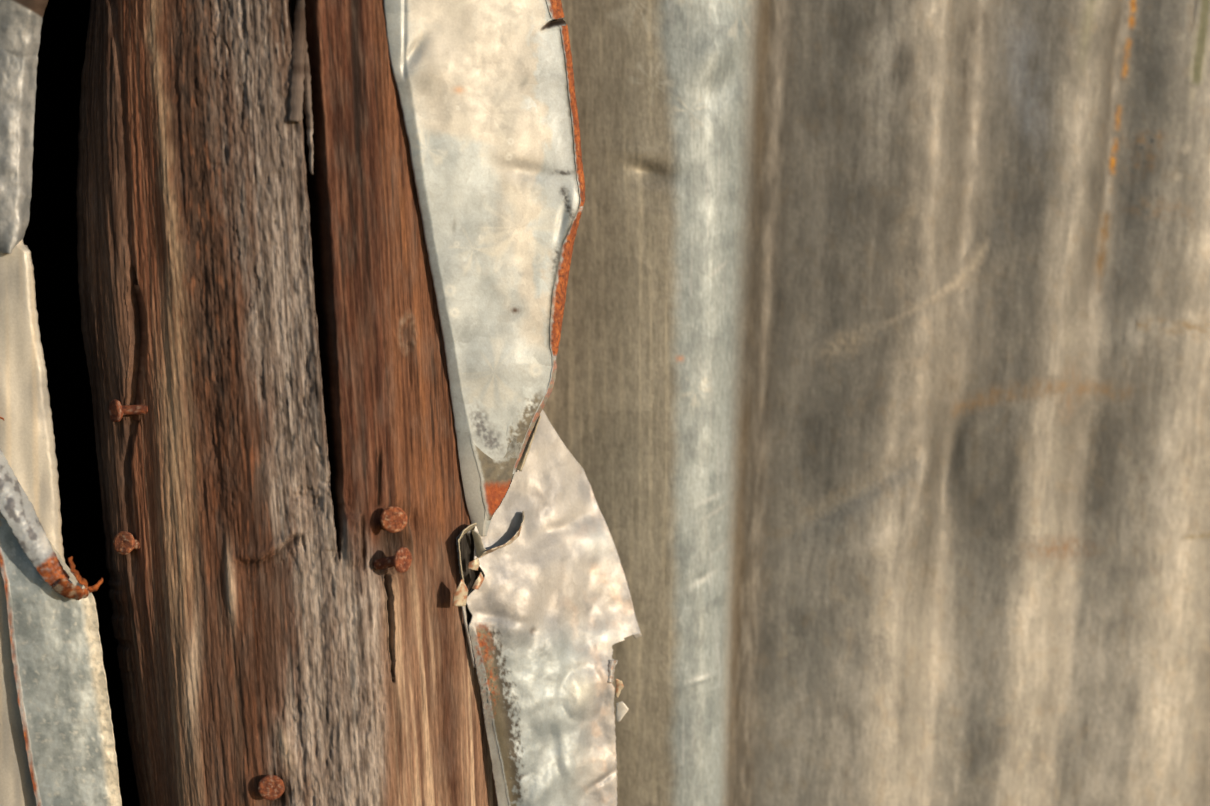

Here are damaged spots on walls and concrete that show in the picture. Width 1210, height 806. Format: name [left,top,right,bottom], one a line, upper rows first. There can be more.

crack [285,0,396,685]
peeling [464,385,548,483]
rust [480,0,585,520]
rust [35,550,70,587]
peeling [485,622,528,806]